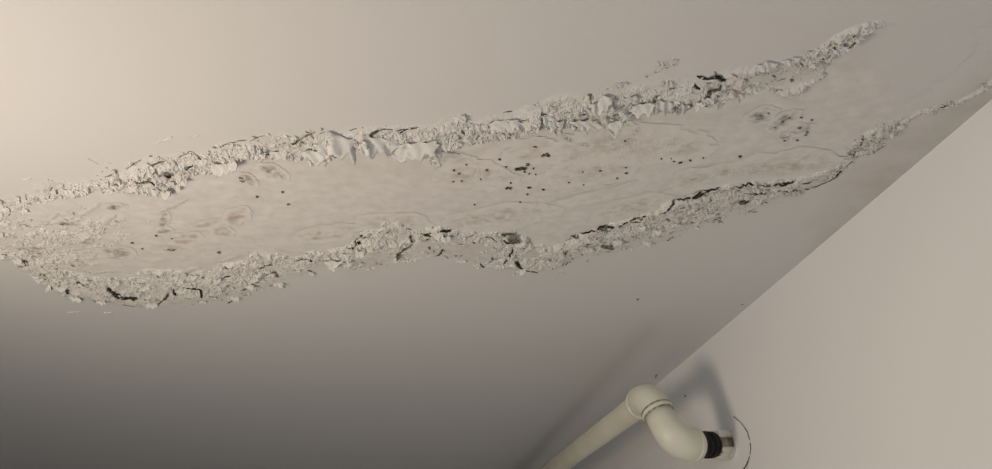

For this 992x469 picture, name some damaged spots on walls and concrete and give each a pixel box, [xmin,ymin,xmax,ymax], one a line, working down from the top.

peeling [0,20,909,313]